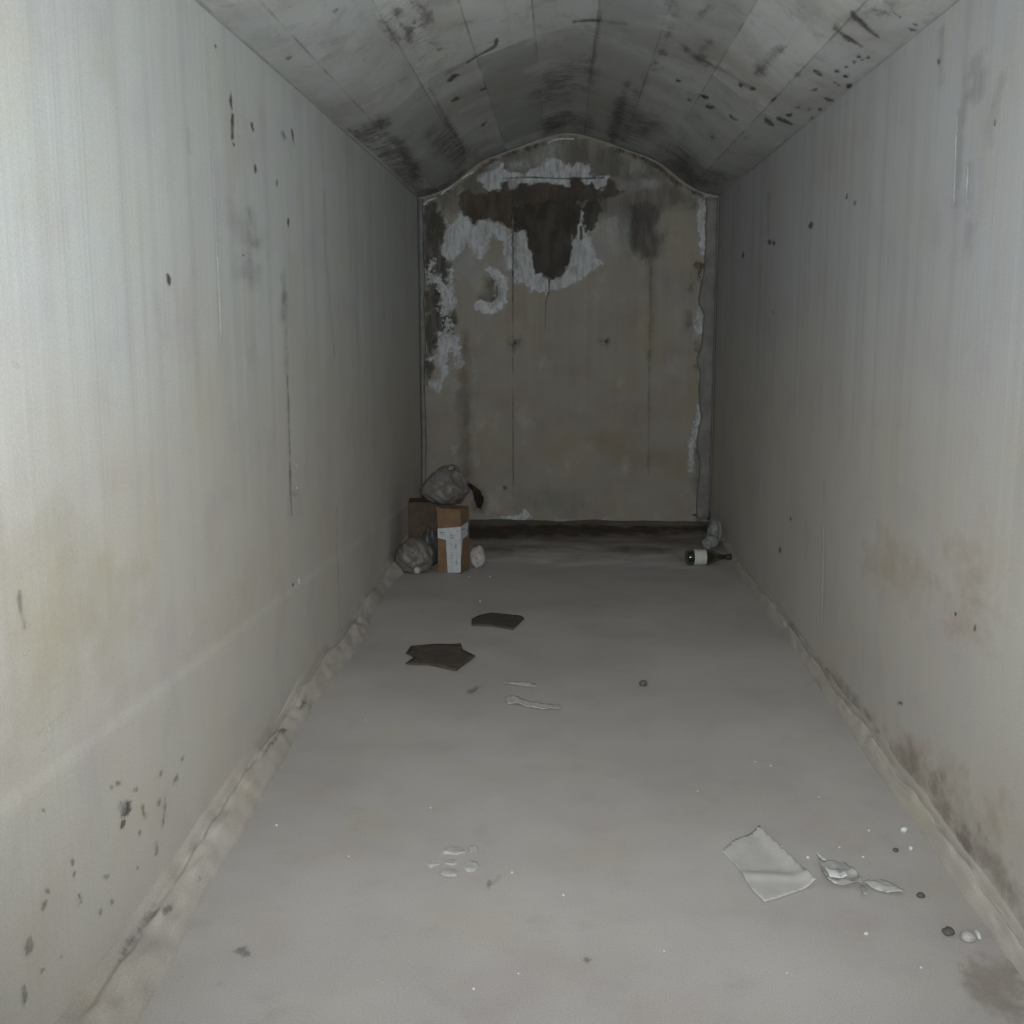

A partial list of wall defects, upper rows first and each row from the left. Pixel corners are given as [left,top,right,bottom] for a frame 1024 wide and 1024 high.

water stain [423,103,707,393]
water stain [688,404,701,472]